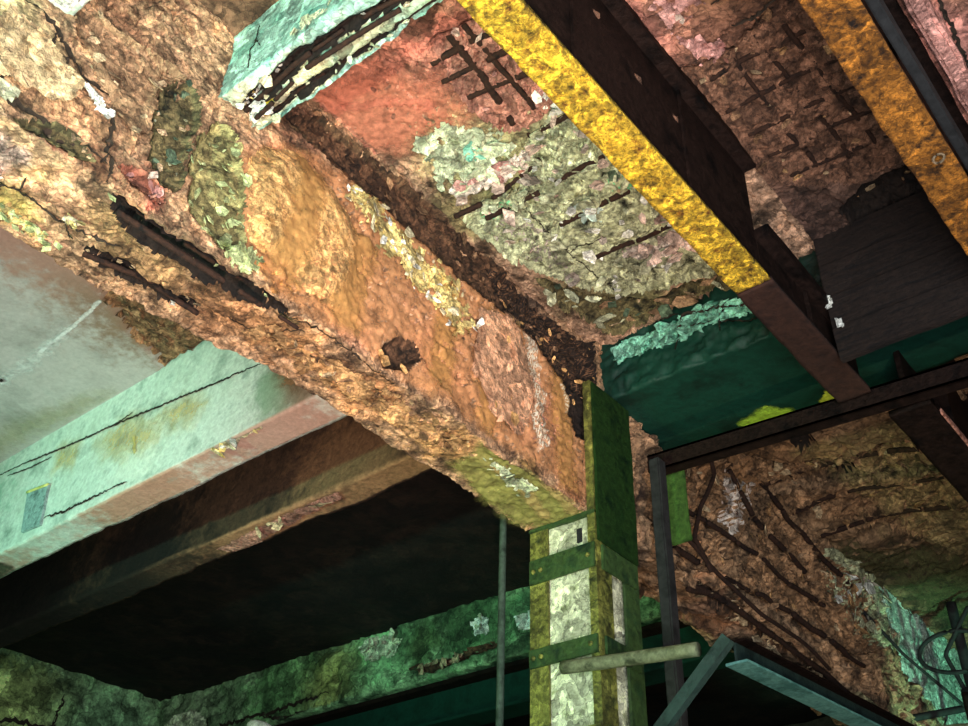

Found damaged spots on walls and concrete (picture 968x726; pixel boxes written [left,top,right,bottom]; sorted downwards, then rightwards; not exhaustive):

spalling [13,118,96,163]
spalling [50,0,304,367]
rust [270,156,325,285]
rust [315,75,468,148]
spalling [235,0,752,440]
rust [429,279,461,389]
crack [0,363,261,476]
rust [552,373,575,488]
crack [44,482,125,518]
peeling [216,492,342,552]
spalling [672,439,963,692]
crack [0,694,65,726]